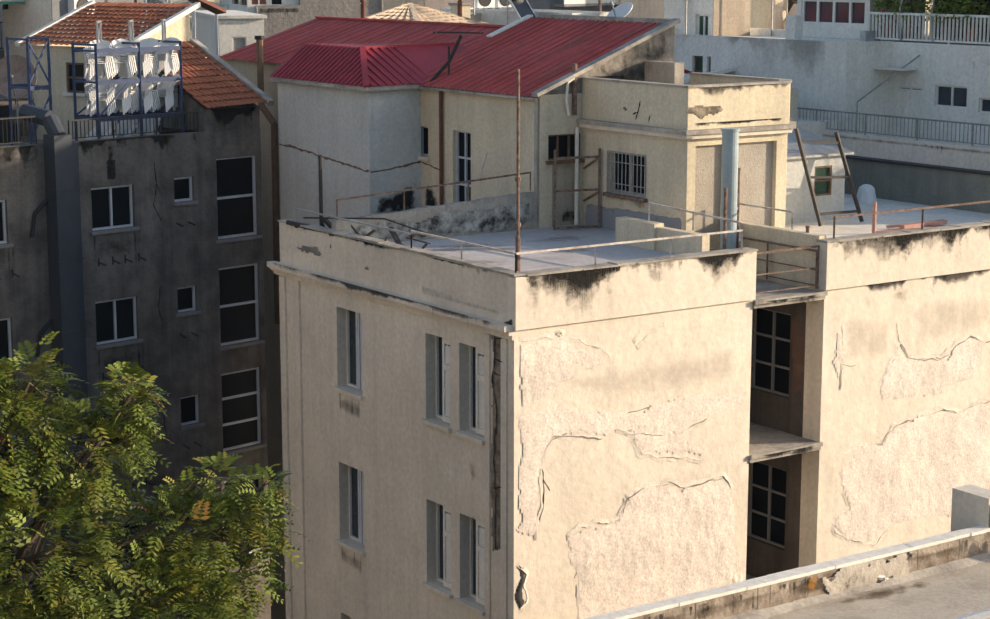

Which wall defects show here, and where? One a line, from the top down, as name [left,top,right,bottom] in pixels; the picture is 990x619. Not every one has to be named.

crack [279,144,444,173]
damp [527,266,621,296]
damp [699,252,745,273]
damp [839,225,990,253]
flaking render [490,335,501,551]
flaking render [517,392,746,540]
flaking render [832,325,990,548]
flaking render [566,472,741,619]
flaking render [515,563,529,612]